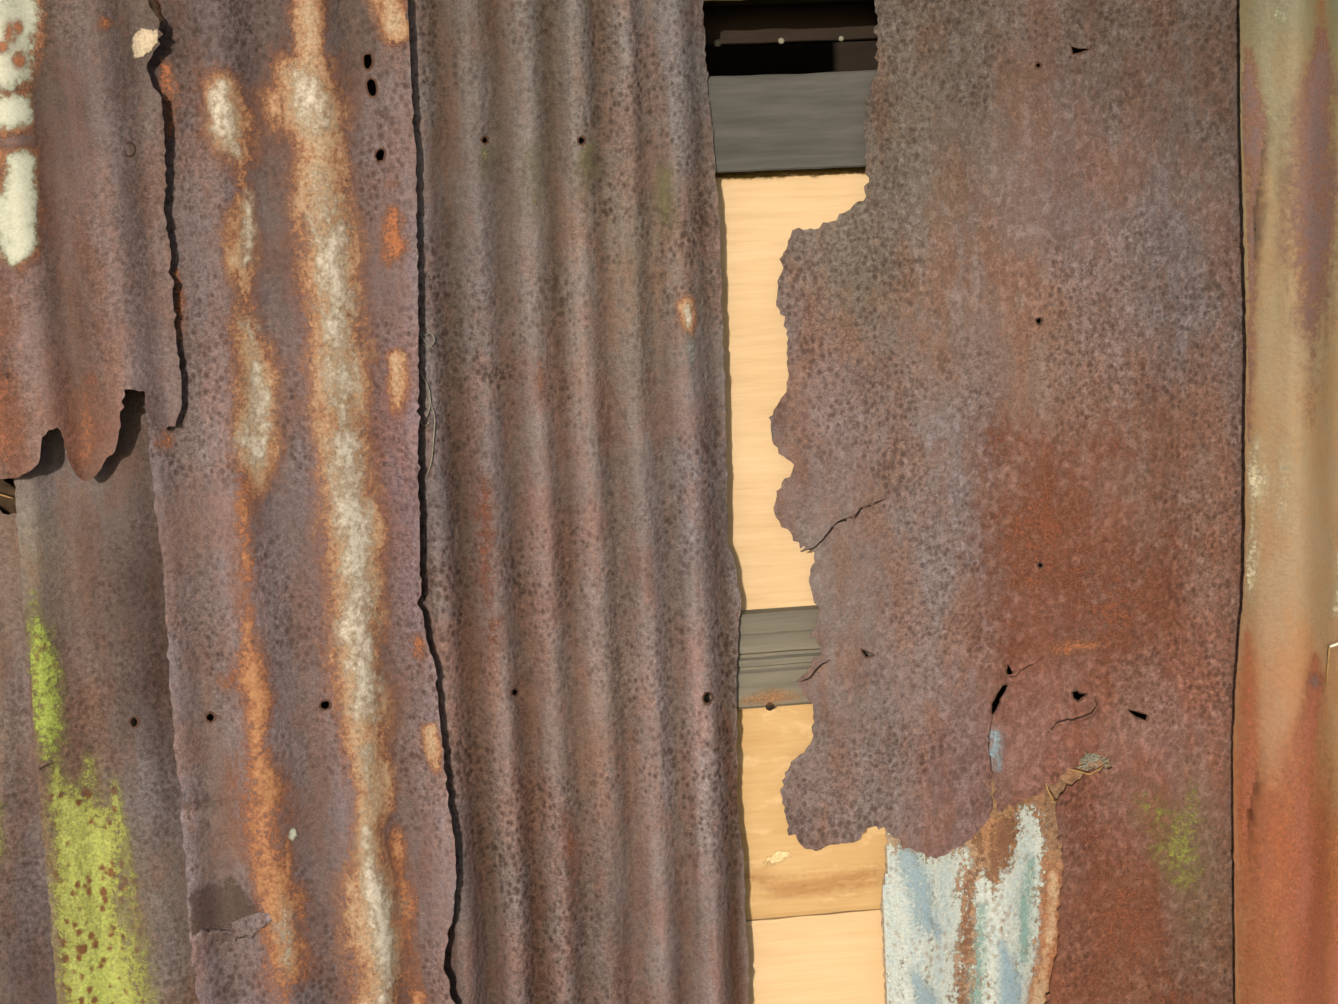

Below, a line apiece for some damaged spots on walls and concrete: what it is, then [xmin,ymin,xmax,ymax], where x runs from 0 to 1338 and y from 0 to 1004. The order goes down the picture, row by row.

peeling [0,0,41,131]
peeling [0,149,38,266]
rust [1241,52,1268,442]
rust [0,0,369,1004]
rust [321,0,750,1004]
crack [800,497,888,552]
crack [1008,659,1039,677]
crack [1047,696,1100,734]
peeling [883,804,1047,1004]
rust [956,815,1017,1004]
rust [1027,868,1062,1004]